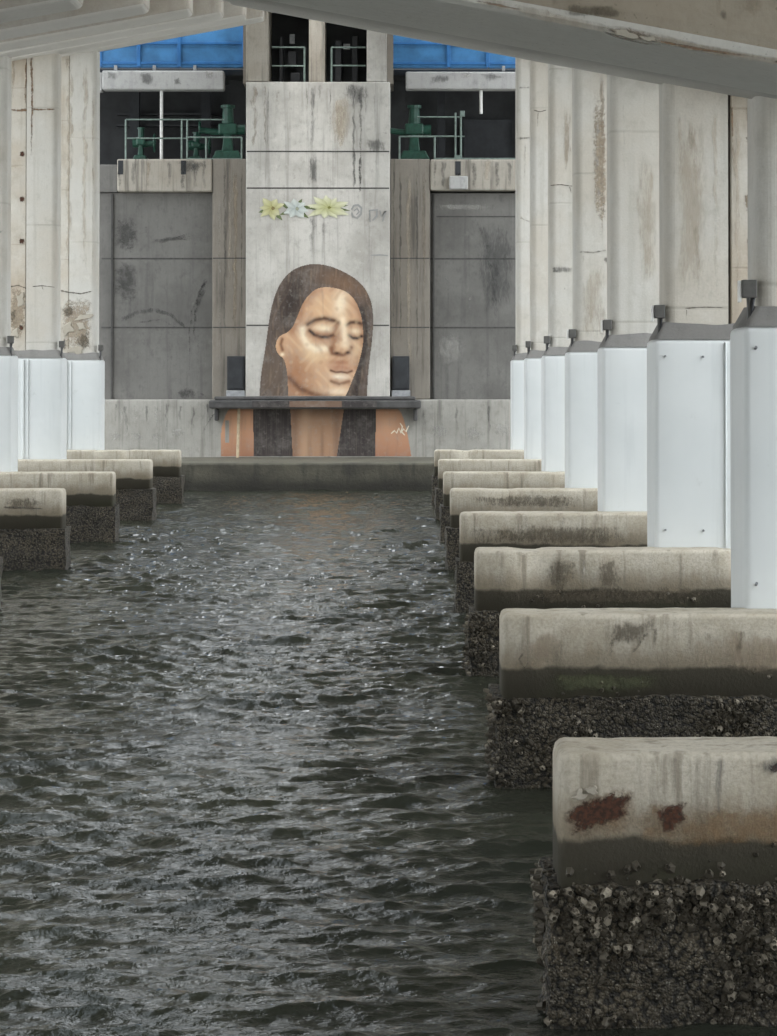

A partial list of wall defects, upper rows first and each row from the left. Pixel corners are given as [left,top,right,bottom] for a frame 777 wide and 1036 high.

peeling [61,290,94,354]
damp [613,623,644,651]
rust [568,785,631,833]
rust [645,803,686,836]